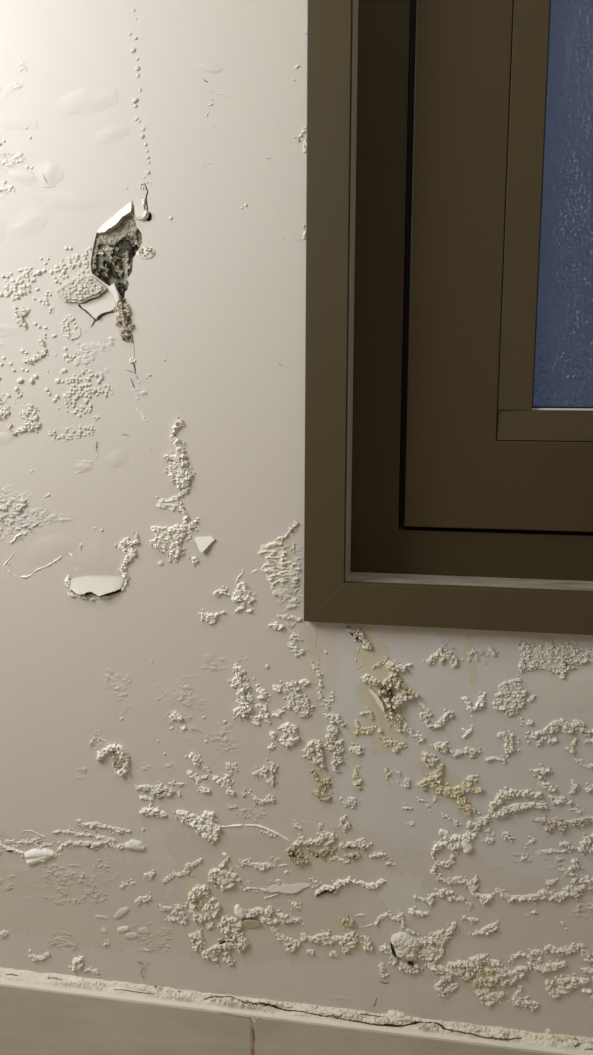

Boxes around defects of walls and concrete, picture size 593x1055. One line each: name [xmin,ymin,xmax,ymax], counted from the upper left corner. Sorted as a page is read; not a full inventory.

spalling [55,182,156,342]
crack [68,304,113,340]
peeling [4,533,130,600]
spalling [185,531,215,566]
leakage [0,520,593,1012]
crack [390,943,414,968]
crack [205,981,521,1040]